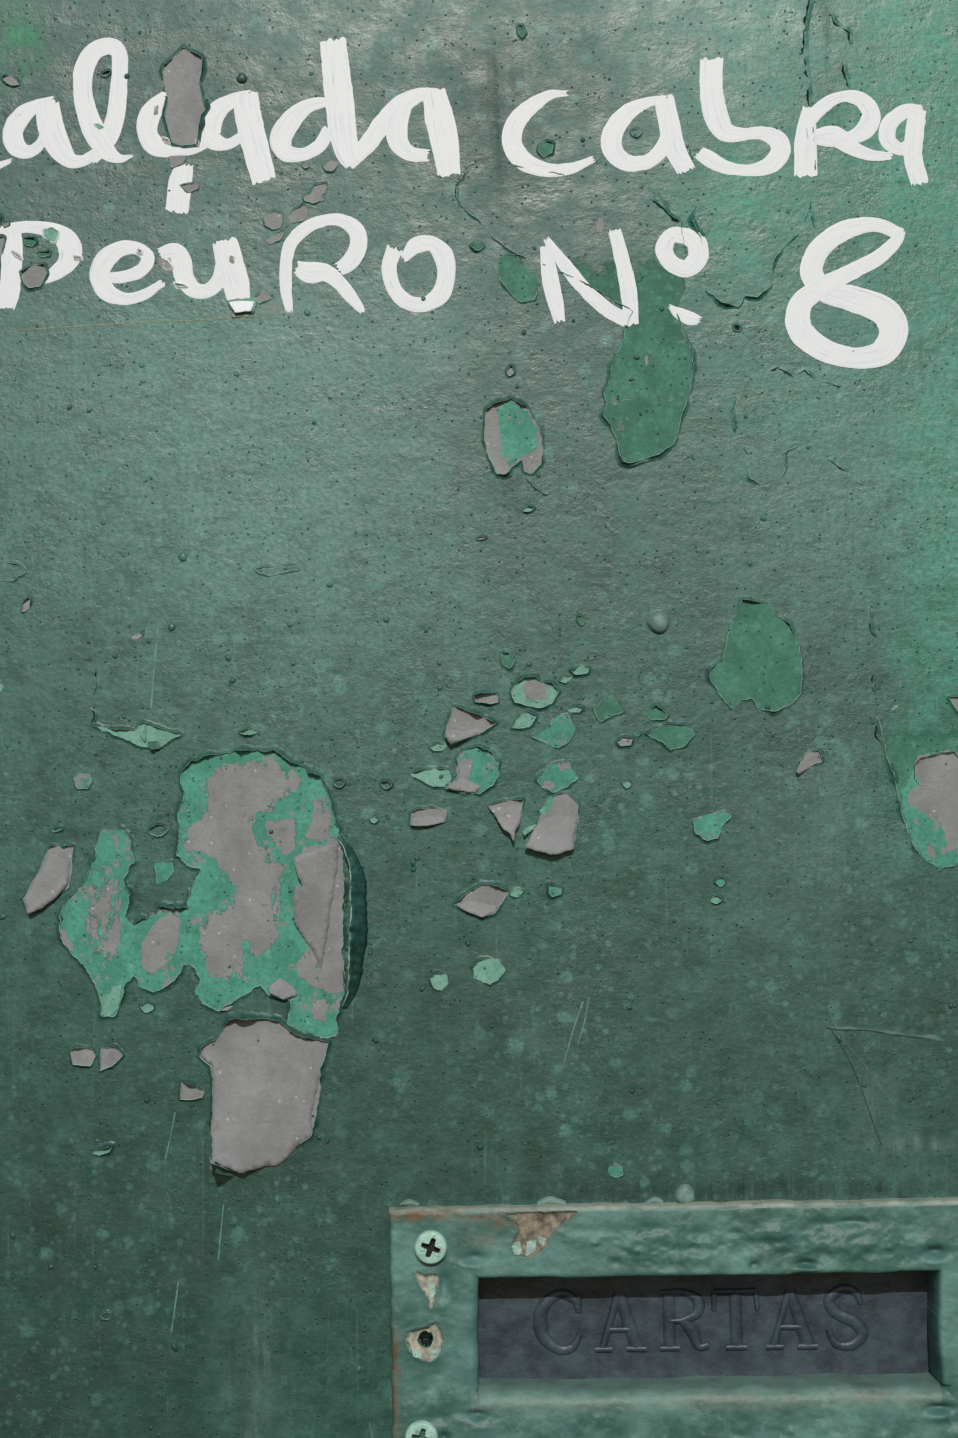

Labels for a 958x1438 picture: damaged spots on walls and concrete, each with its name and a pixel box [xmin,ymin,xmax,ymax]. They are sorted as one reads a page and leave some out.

peeling [154,44,211,193]
peeling [679,39,812,310]
peeling [456,170,698,480]
peeling [90,718,185,751]
peeling [407,672,582,855]
peeling [643,701,697,753]
peeling [704,595,805,717]
peeling [875,693,958,870]
peeling [21,744,368,1173]
peeling [428,969,449,992]
peeling [450,880,511,921]
peeling [471,955,508,988]